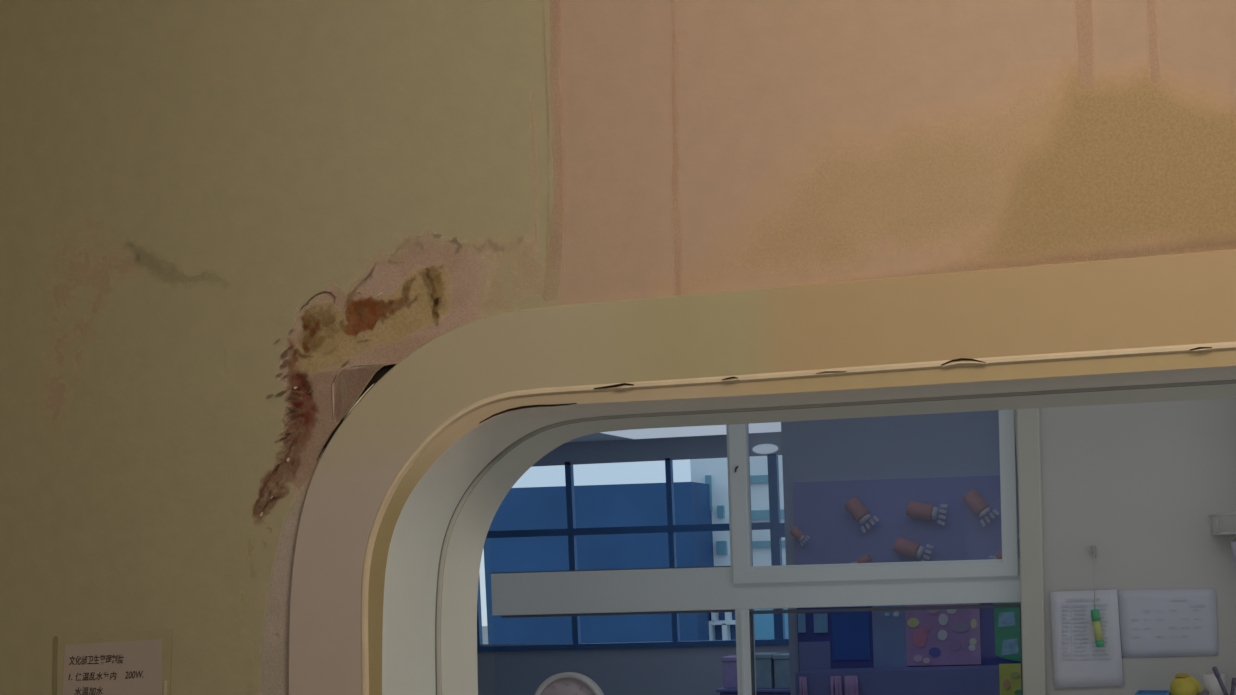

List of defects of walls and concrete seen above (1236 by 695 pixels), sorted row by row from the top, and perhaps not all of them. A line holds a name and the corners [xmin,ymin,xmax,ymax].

water stain [745,0,1236,267]
rust [253,266,449,521]
crack [317,364,396,460]
peeling [249,231,542,695]